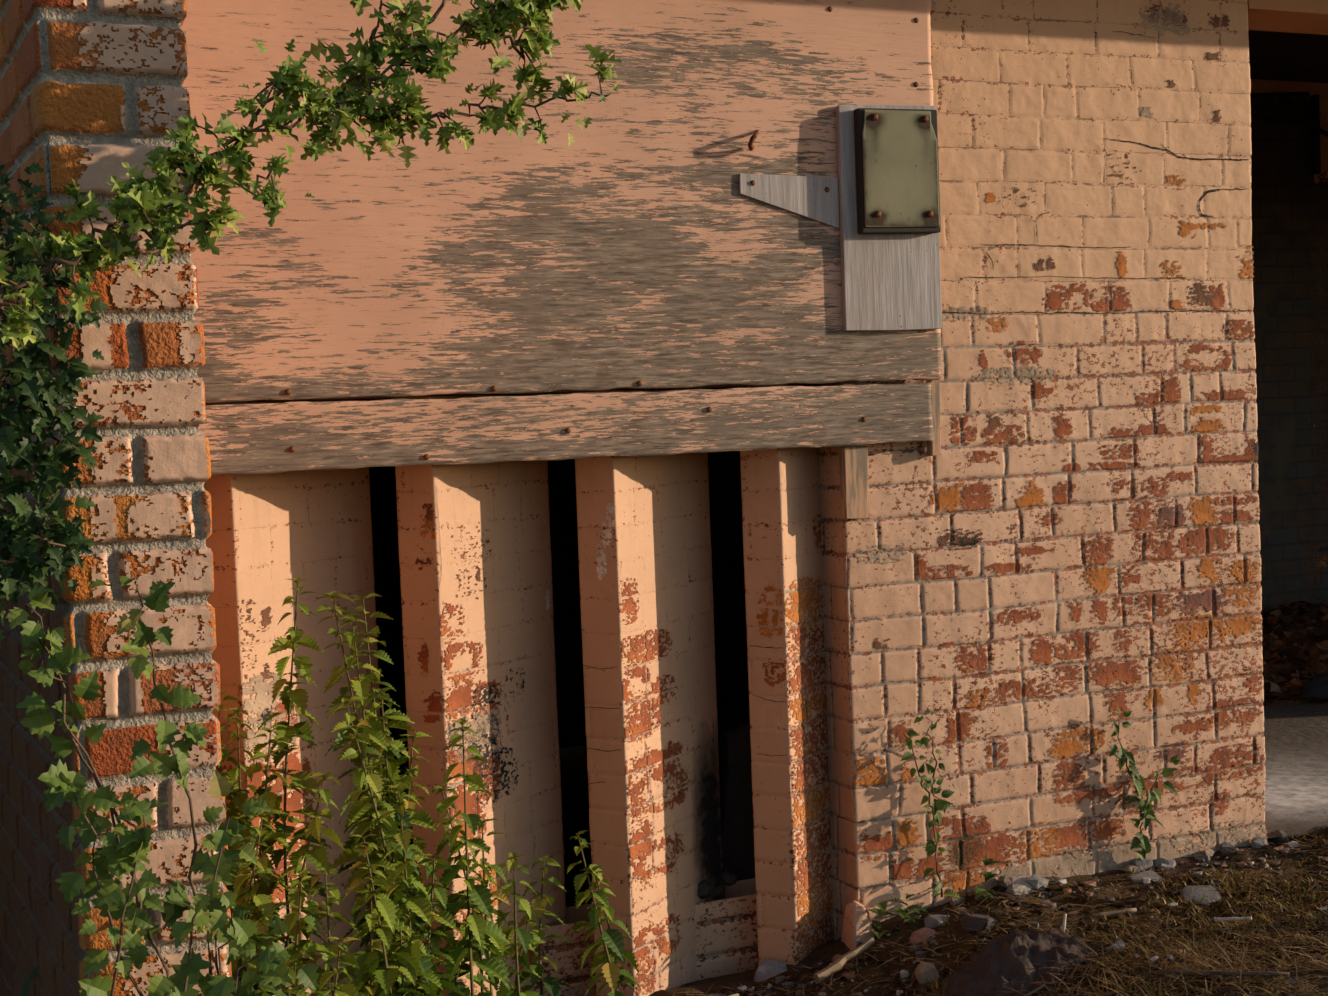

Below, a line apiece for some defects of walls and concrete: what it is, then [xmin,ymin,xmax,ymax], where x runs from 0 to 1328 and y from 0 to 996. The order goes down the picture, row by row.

peeling [73,0,189,242]
crack [1103,138,1248,217]
peeling [71,166,318,996]
peeling [420,503,436,539]
flaking render [417,526,526,840]
damp [596,503,615,580]
flaking render [619,577,692,884]
flaking render [756,576,834,962]
flaking render [633,913,682,996]